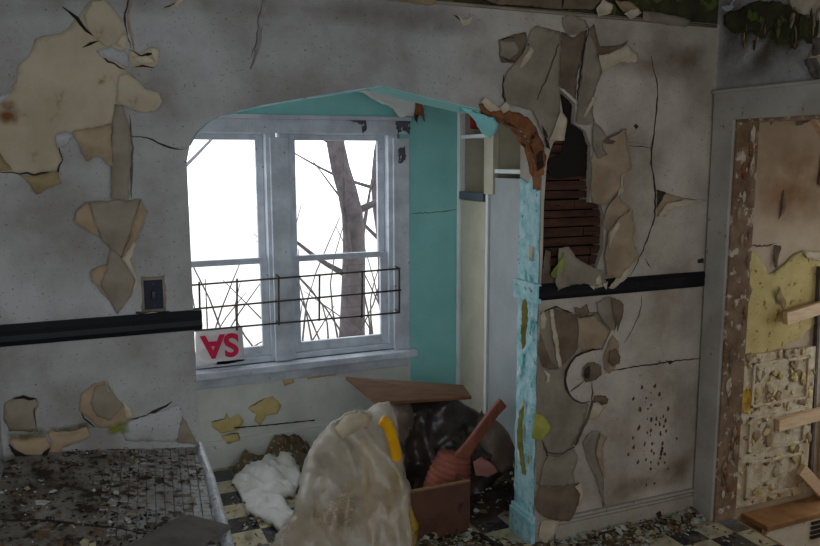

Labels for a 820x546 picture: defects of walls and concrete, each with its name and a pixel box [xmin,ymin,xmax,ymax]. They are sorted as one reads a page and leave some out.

peeling [724,0,820,79]
peeling [0,0,167,314]
peeling [358,90,425,134]
peeling [459,106,499,139]
spalling [488,0,691,284]
crack [630,57,658,274]
crack [625,295,642,342]
peeling [8,381,134,457]
peeling [211,413,243,444]
peeling [514,298,611,516]
crack [605,358,700,373]
peeling [721,245,820,499]